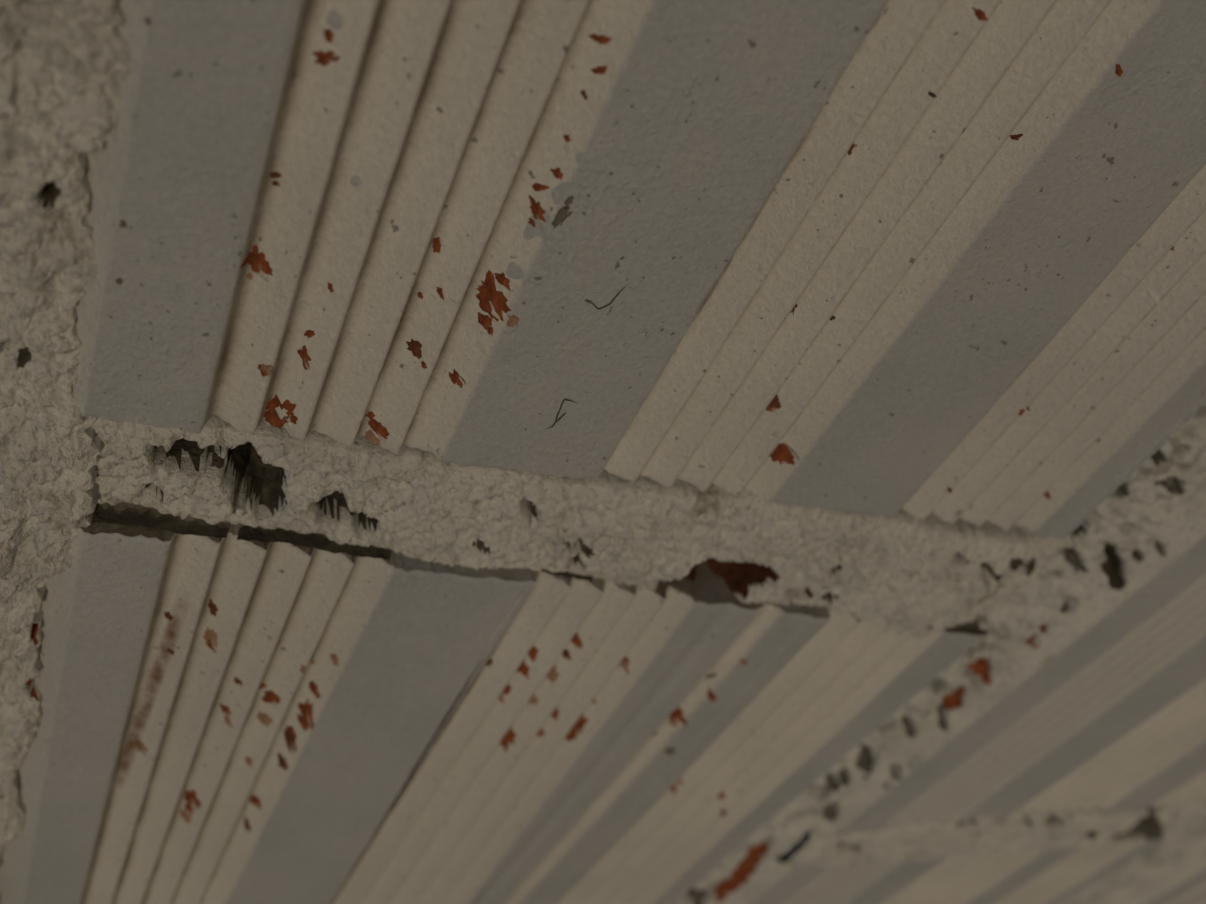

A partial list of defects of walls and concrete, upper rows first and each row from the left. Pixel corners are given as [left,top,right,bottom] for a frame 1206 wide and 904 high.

crack [93,511,392,566]
crack [542,569,593,582]
crack [925,625,988,635]